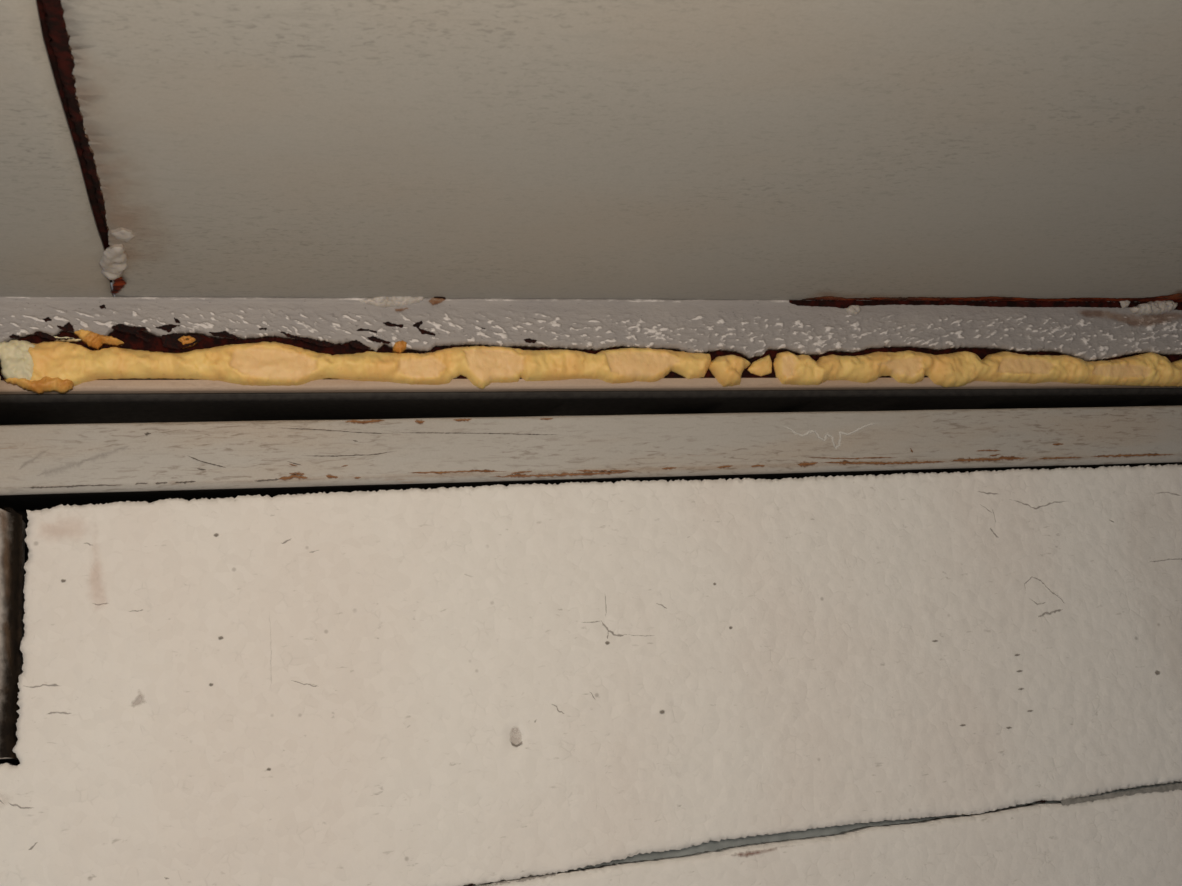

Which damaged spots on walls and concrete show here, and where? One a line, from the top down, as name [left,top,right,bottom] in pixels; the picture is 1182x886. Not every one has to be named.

corrosion [789,293,1182,310]
peeling [9,317,241,350]
peeling [281,332,334,347]
peeling [349,321,435,353]
crack [1035,783,1182,806]
crack [463,874,556,886]